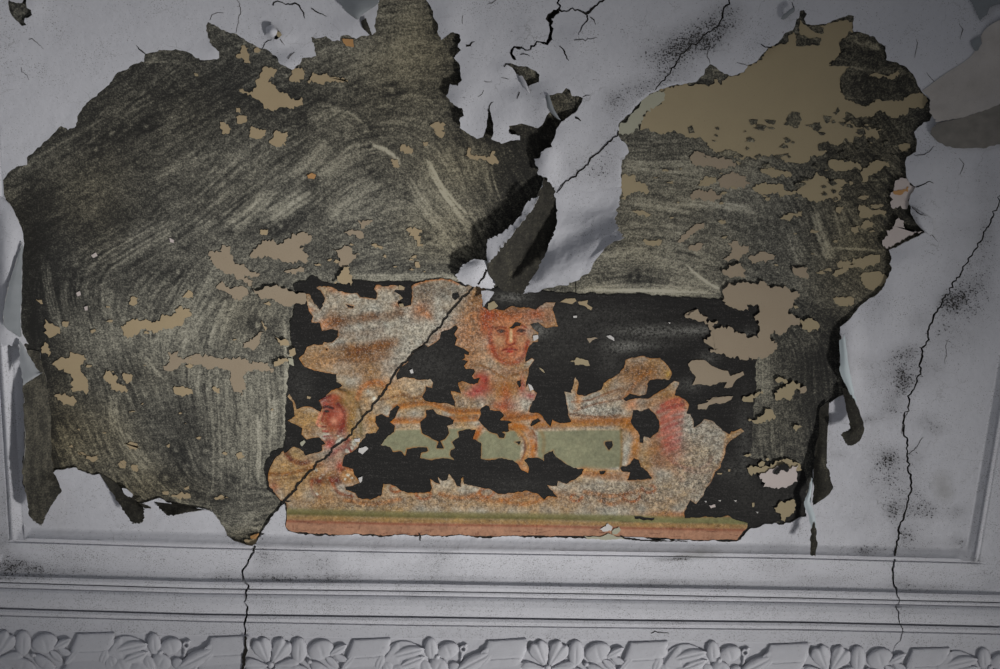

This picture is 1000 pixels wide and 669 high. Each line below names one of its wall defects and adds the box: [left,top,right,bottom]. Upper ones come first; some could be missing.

crack [273,1,325,18]
crack [478,0,605,112]
crack [657,0,730,87]
crack [556,131,619,193]
peeling [3,0,932,549]
damp [880,213,995,413]
crack [241,269,487,669]
damp [853,448,962,556]
crack [892,196,1000,631]